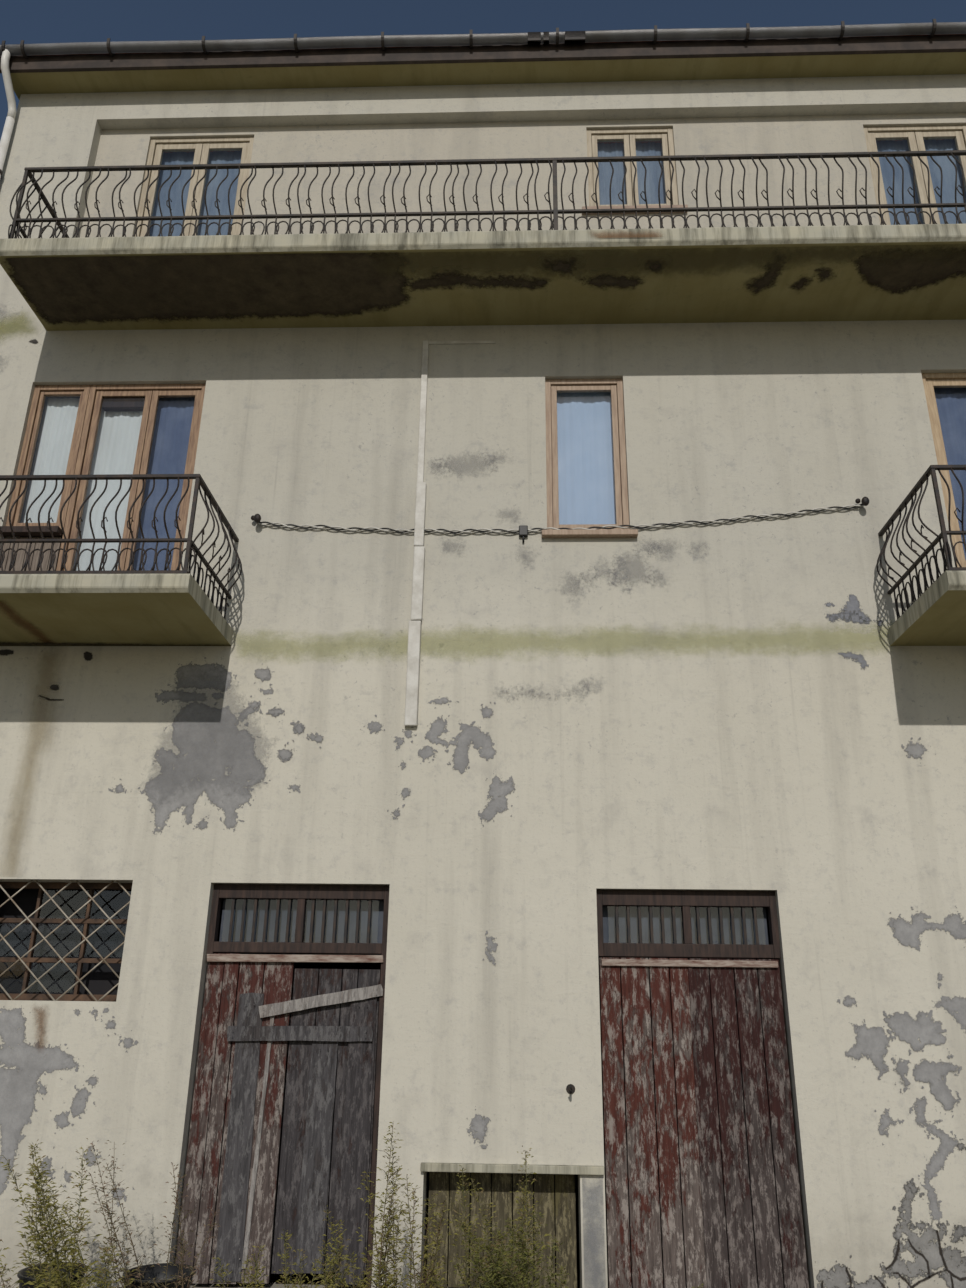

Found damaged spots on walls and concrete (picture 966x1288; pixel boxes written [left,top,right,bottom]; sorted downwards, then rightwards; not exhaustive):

water stain [382,246,966,275]
peeling [825,594,883,628]
peeling [838,652,869,670]
peeling [108,657,324,835]
peeling [360,696,518,827]
peeling [902,737,931,759]
peeling [887,907,966,951]
peeling [75,1007,139,1053]
peeling [0,1006,101,1194]
peeling [467,1106,491,1149]
flaking render [815,974,966,1288]
crack [821,1230,966,1288]